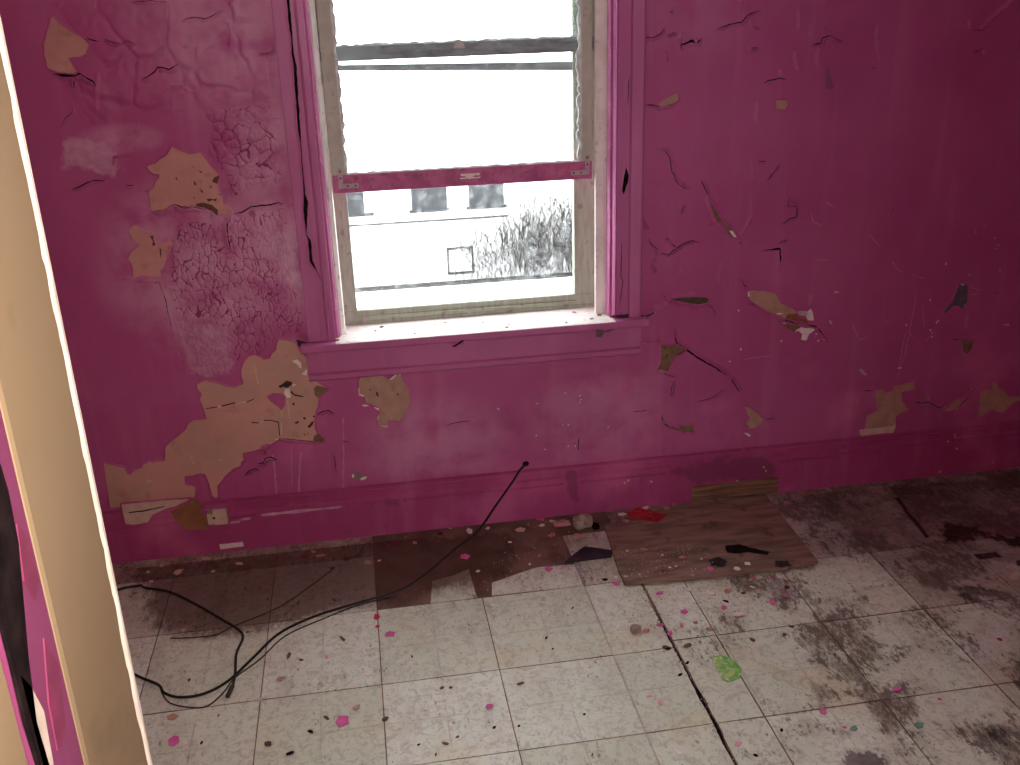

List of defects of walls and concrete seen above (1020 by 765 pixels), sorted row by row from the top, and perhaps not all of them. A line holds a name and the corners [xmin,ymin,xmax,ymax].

crack [71,0,329,341]
crack [616,242,624,307]
peeling [741,278,815,340]
peeling [655,343,687,374]
peeling [0,15,330,765]
peeling [357,374,412,427]
peeling [858,378,916,436]
damp [939,521,1020,559]